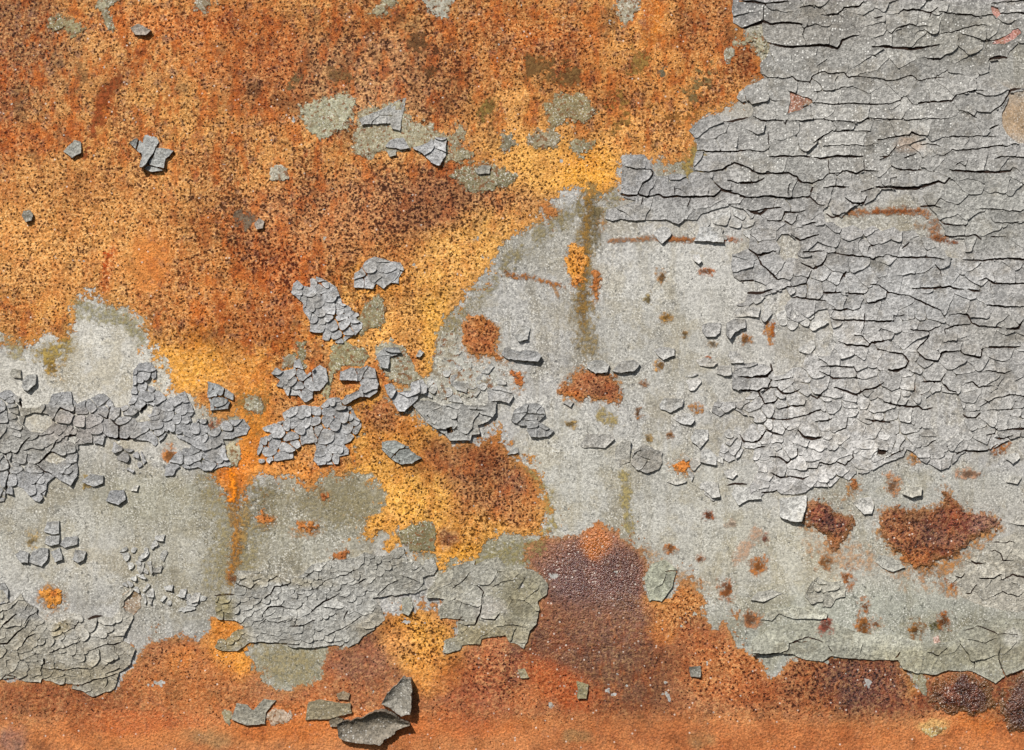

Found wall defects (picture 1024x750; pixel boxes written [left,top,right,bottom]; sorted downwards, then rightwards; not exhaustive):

crack [605,0,1024,493]
rust [847,207,958,244]
peeling [291,277,362,343]
peeling [0,362,250,505]
peeling [257,347,553,465]
rust [556,366,623,426]
peeling [659,296,1024,522]
rust [802,478,872,589]
rust [876,468,1003,597]
peeling [0,534,548,697]
rust [717,580,764,628]
peeling [305,676,413,745]